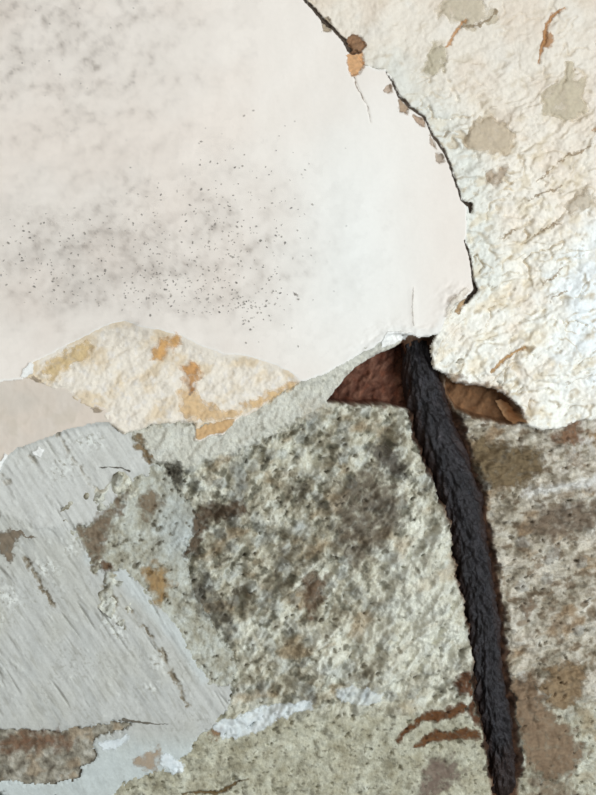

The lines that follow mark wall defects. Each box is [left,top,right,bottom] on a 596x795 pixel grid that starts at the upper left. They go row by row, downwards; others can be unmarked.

crack [304,0,368,107]
crack [446,9,498,47]
crack [383,72,473,213]
crack [455,240,478,314]
corrosion [407,410,433,479]
peeling [307,0,596,795]
crack [490,346,525,373]
spalling [0,321,497,795]
corrosion [396,670,493,778]